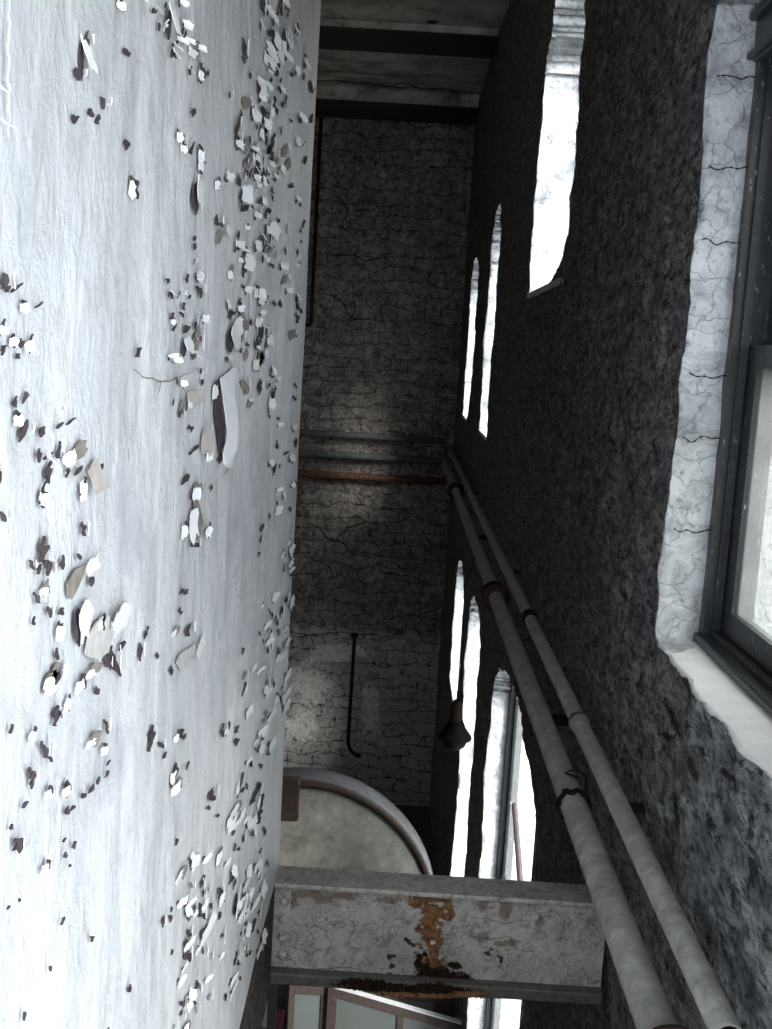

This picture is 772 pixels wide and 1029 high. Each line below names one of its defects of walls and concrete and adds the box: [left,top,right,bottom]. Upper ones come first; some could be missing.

peeling [74,31,98,82]
peeling [71,96,113,124]
peeling [145,0,212,84]
crack [717,73,756,81]
peeling [165,0,315,475]
peeling [11,391,109,509]
peeling [181,474,213,547]
peeling [28,536,159,726]
peeling [21,717,112,815]
peeling [147,724,190,797]
rust [291,890,360,908]
rust [330,896,493,999]